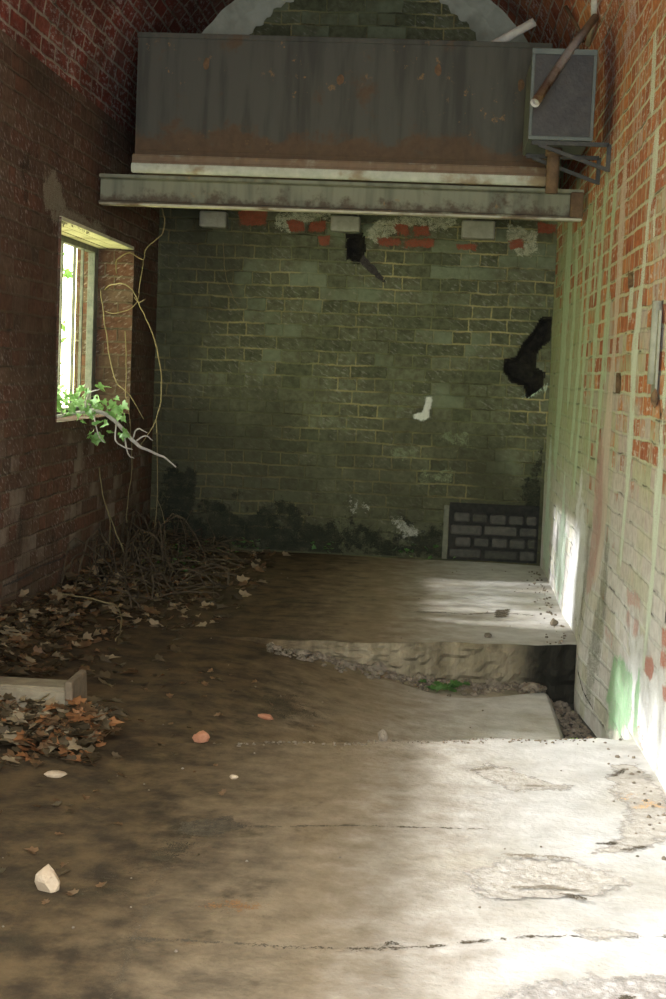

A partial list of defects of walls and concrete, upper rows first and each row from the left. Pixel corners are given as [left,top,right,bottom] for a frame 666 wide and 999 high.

peeling [238,210,331,246]
peeling [345,216,459,283]
spalling [503,316,552,399]
leakage [519,121,660,712]
leakage [151,463,443,558]
leakage [623,318,666,791]
spalling [591,764,666,854]
spalling [465,853,631,900]
spalling [495,973,666,999]